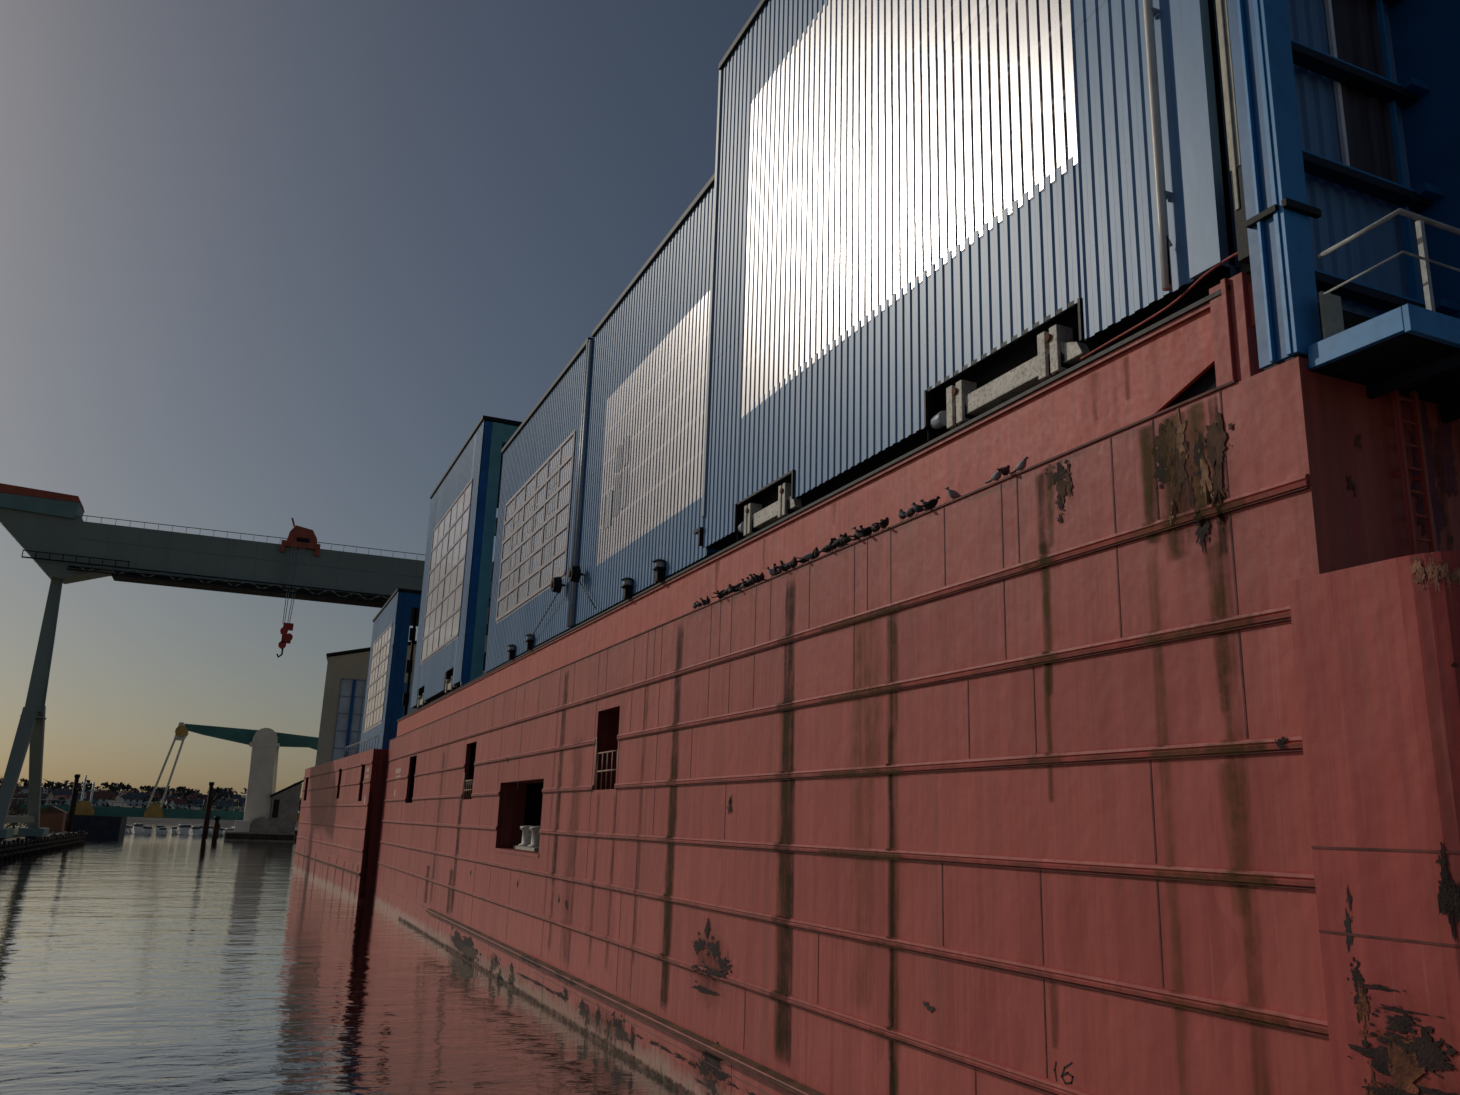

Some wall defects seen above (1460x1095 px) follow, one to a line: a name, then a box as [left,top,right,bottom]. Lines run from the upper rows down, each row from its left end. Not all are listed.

spalling [1410,495,1460,595]
peeling [1435,842,1460,942]
peeling [1347,957,1458,1095]